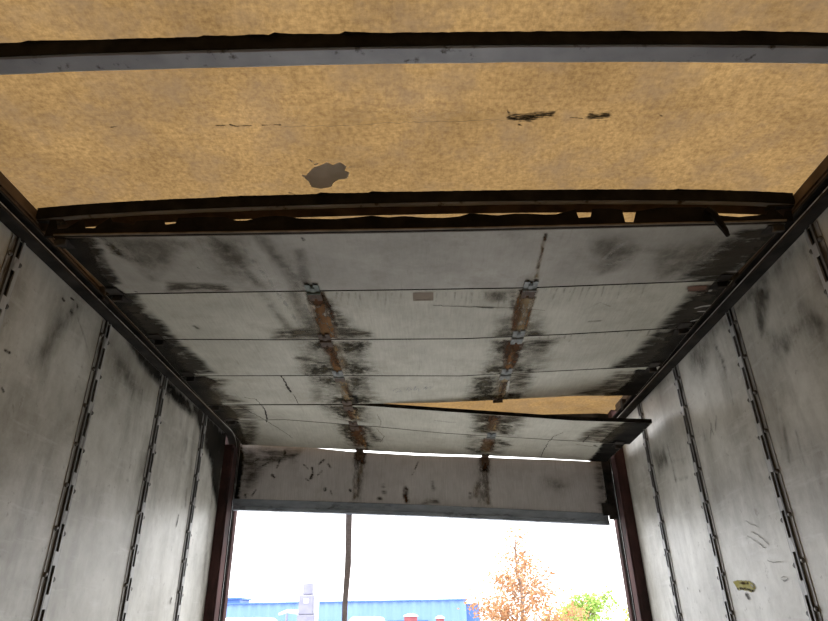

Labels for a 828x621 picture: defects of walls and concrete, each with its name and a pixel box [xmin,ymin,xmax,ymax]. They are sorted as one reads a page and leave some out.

leakage [79,238,170,286]
leakage [168,283,228,291]
rust [496,290,537,399]
leakage [579,229,774,396]
leakage [121,295,297,505]
crack [241,397,292,438]
rust [307,292,368,498]
rust [475,415,500,503]
leakage [471,415,519,445]